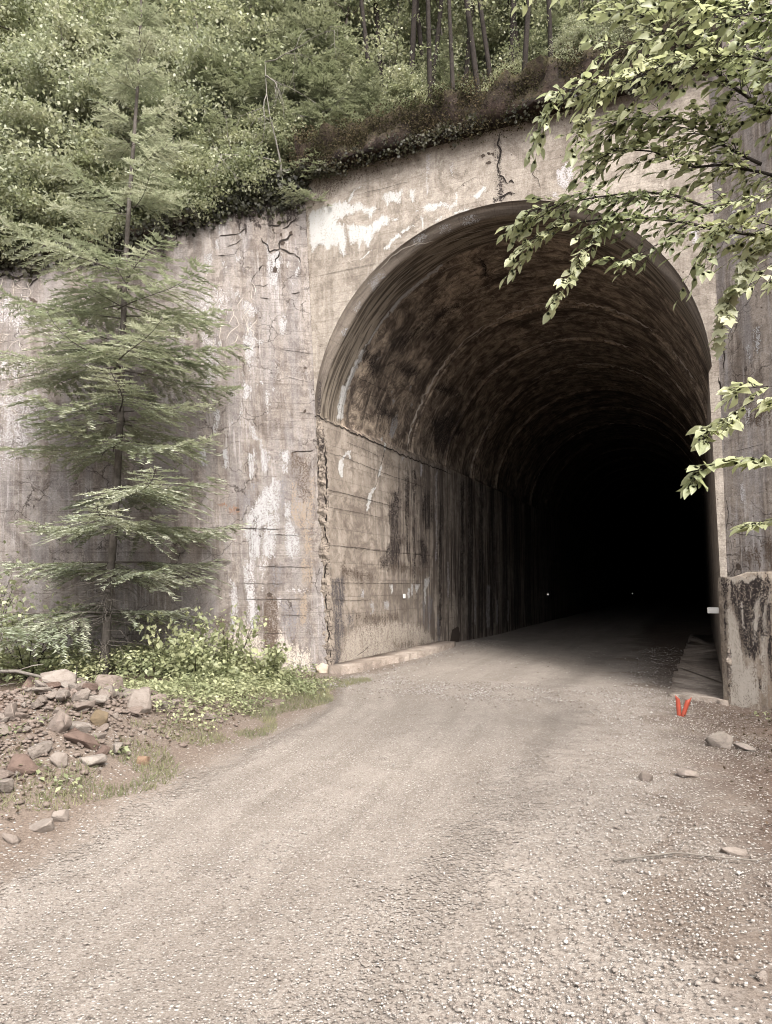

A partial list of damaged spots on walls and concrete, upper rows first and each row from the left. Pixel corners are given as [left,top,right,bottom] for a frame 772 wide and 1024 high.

crack [457,133,540,197]
crack [194,218,301,364]
spalling [316,418,335,665]
water stain [331,410,555,663]
water stain [719,535,772,707]